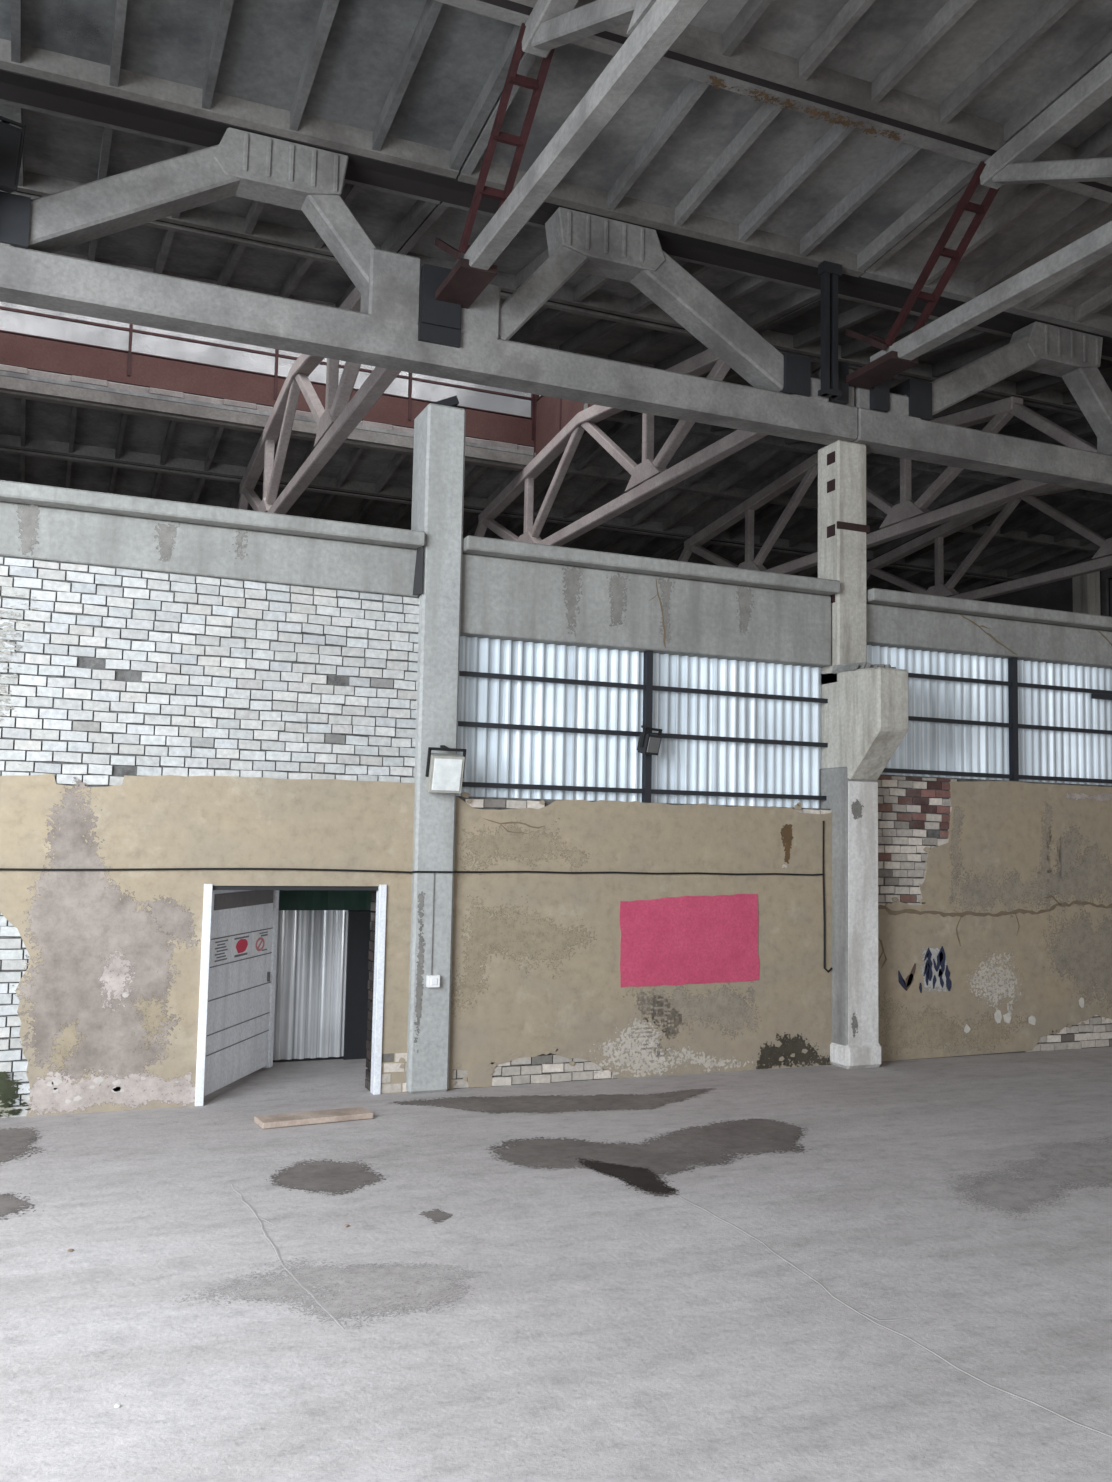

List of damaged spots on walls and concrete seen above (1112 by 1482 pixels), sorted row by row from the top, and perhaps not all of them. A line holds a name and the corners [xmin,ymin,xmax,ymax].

corrosion [706,75,905,141]
corrosion [780,824,793,868]
spalling [878,776,957,908]
leakage [12,777,200,1082]
crack [878,896,1112,1004]
spalling [449,1064,474,1088]
spalling [486,1047,616,1086]
leakage [393,981,762,1114]
spalling [994,997,1112,1052]
leakage [567,1157,679,1195]